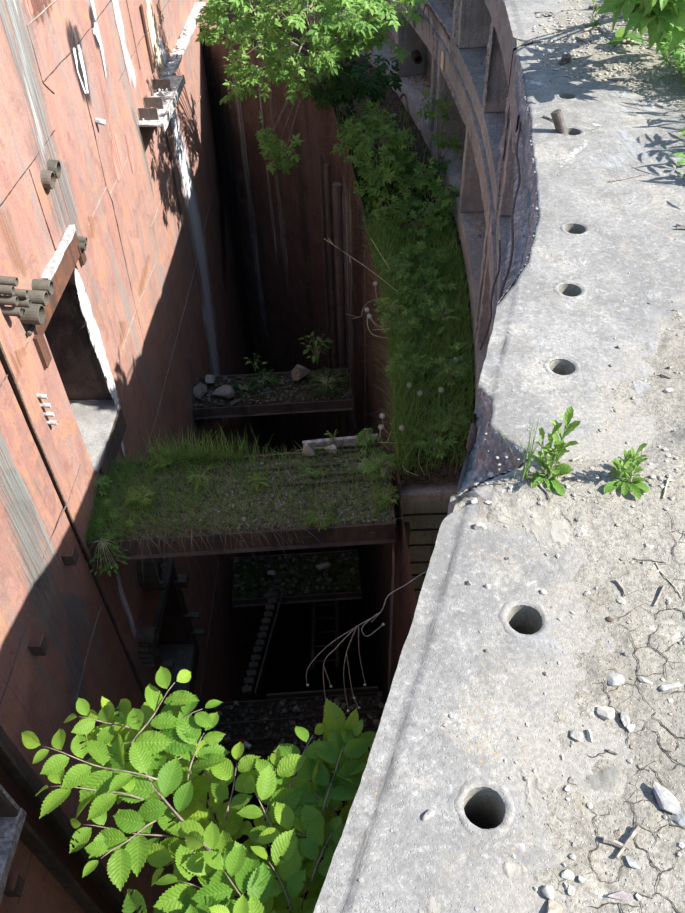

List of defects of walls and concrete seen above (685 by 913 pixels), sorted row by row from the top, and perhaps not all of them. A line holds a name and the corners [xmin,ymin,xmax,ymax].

spalling [479,55,539,350]
spalling [450,389,528,502]